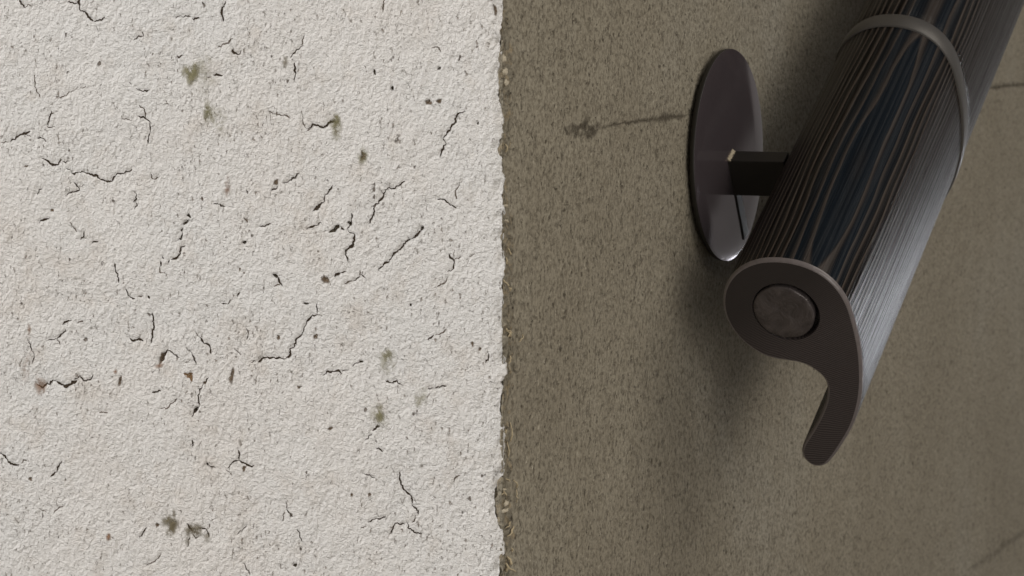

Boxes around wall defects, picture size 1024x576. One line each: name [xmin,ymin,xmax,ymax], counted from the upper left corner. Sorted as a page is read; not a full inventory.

damp [184,65,198,83]
spalling [498,39,509,108]
crack [2,75,158,209]
spalling [498,133,508,159]
crack [307,181,422,284]
spalling [500,194,512,264]
crack [27,320,93,389]
crack [114,264,211,446]
crack [236,304,322,363]
spalling [501,279,524,364]
spalling [495,381,519,574]
damp [163,513,207,536]